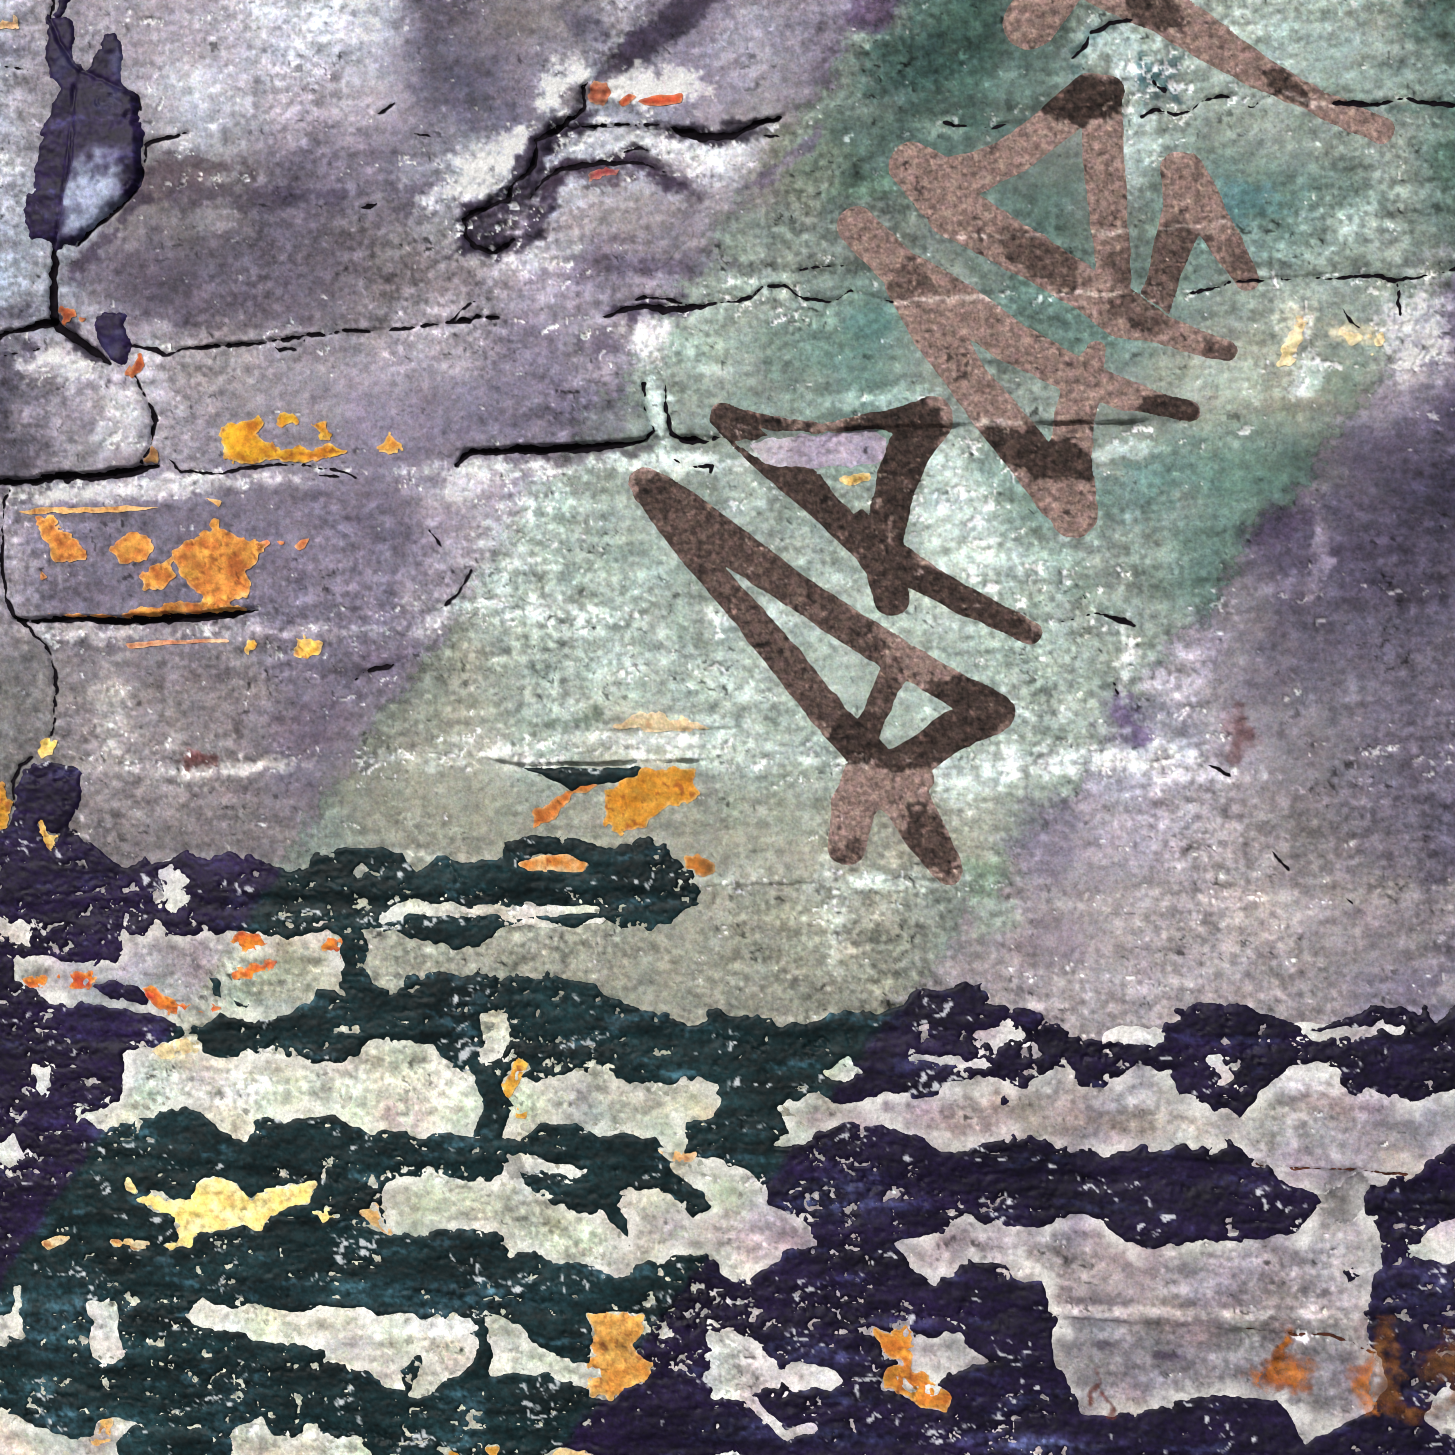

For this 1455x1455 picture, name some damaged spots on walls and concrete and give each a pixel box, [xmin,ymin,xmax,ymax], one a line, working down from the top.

crack [1071,18,1132,59]
peeling [23,0,145,252]
crack [943,120,1006,129]
crack [1140,64,1270,119]
crack [1332,97,1455,108]
crack [461,82,782,254]
crack [603,265,894,318]
crack [1190,267,1455,328]
peeling [58,306,144,378]
crack [0,93,500,806]
crack [454,382,720,474]
peeling [0,738,1455,1455]